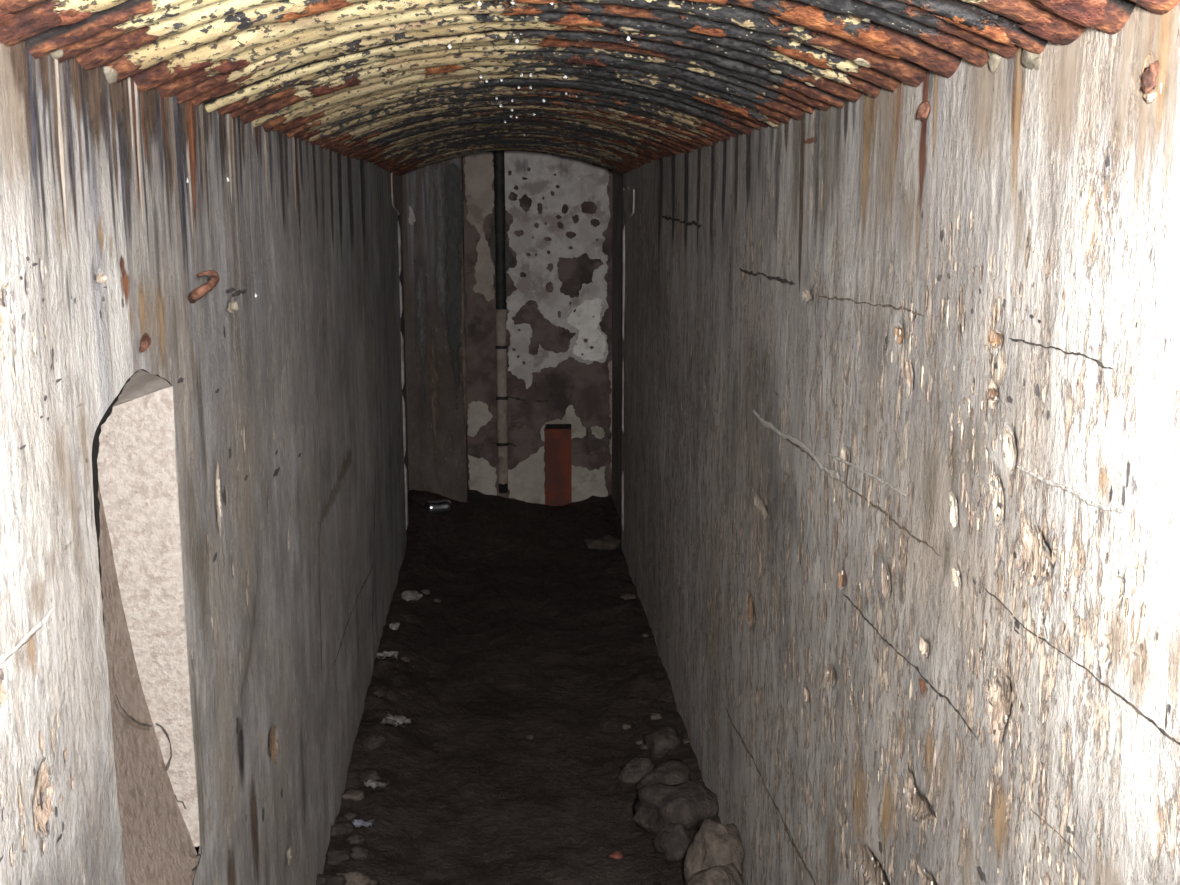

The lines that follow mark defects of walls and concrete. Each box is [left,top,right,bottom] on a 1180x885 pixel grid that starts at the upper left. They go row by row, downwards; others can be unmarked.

corrosion [309,77,362,98]
corrosion [500,0,609,67]
corrosion [688,23,726,38]
corrosion [770,46,832,70]
corrosion [767,5,900,59]
corrosion [1138,2,1180,172]
crack [820,296,923,316]
peeling [464,150,635,532]
crack [1009,338,1113,369]
crack [842,481,938,555]
crack [843,594,979,743]
crack [984,588,1180,745]